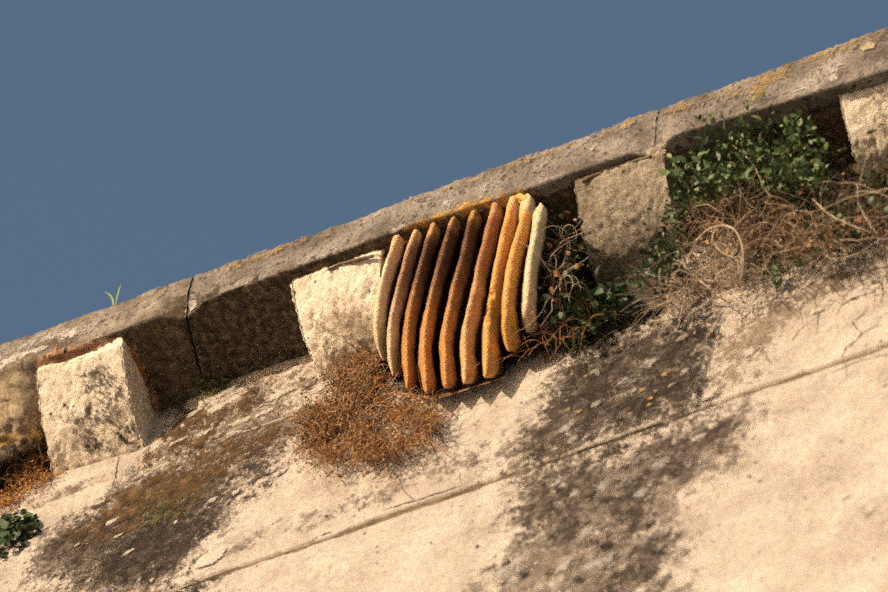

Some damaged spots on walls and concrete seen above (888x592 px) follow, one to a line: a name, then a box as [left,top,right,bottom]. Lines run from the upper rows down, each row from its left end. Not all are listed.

damp [0,443,53,498]
damp [18,208,490,592]
damp [297,103,888,592]
crack [792,277,886,376]